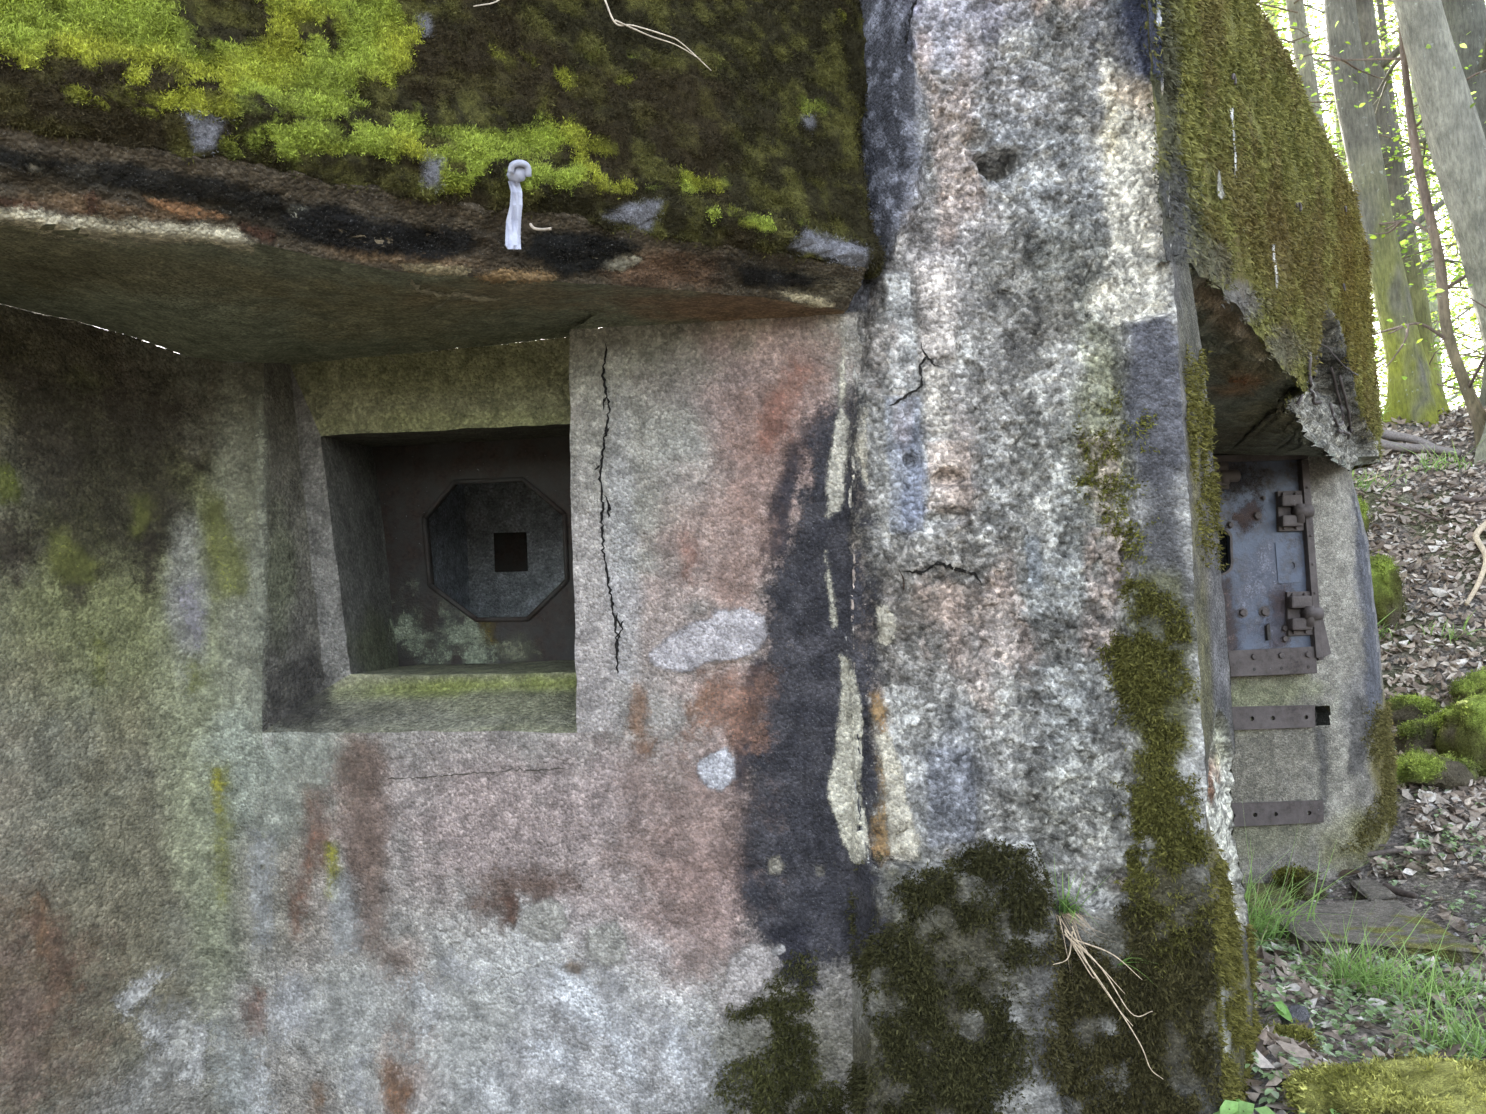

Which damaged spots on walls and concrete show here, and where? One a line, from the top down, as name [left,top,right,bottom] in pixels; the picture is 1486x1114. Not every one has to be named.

crack [904,0,945,43]
spalling [1292,304,1381,471]
crack [594,344,624,674]
rust [1218,463,1265,532]
water stain [730,361,920,993]
rust [1221,580,1239,651]